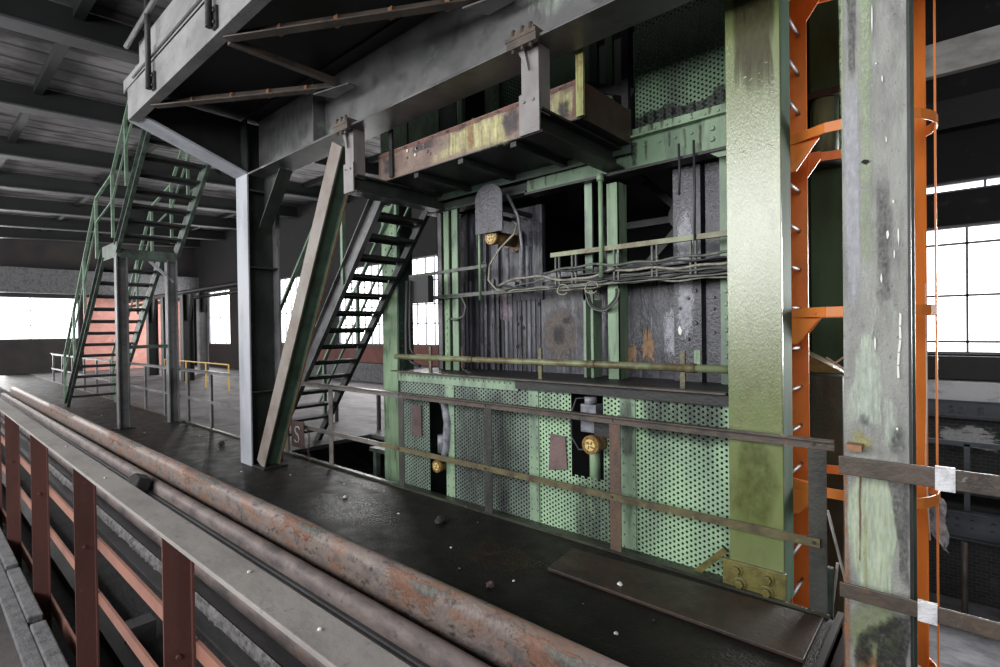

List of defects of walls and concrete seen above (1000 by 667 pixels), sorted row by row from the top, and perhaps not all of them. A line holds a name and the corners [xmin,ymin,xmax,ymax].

rust [380,103,519,173]
rust [550,80,576,117]
water stain [839,0,889,295]
rust [628,328,655,362]
water stain [850,330,899,448]
water stain [847,476,908,594]